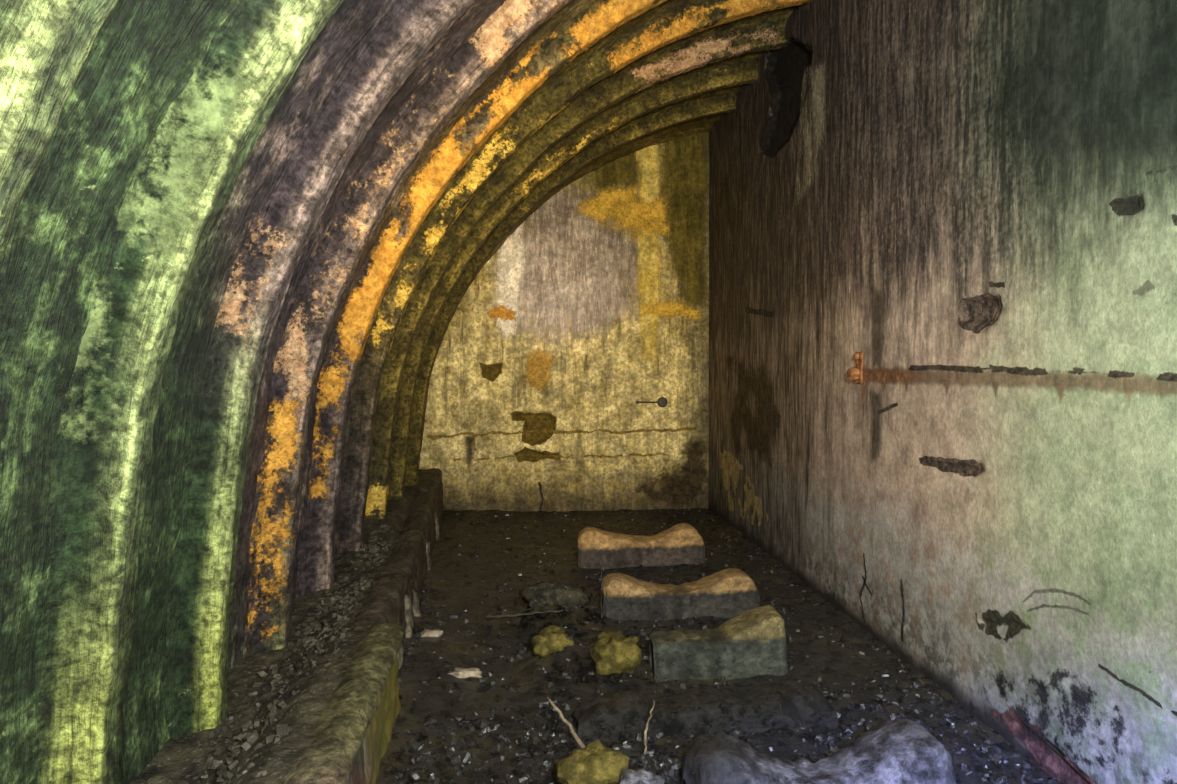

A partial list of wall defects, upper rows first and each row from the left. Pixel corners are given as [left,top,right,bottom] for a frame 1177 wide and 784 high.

water stain [795,62,826,200]
water stain [996,0,1177,212]
spalling [1110,194,1145,215]
peeling [248,0,813,638]
water stain [872,288,884,366]
spalling [958,281,1005,333]
rust [862,368,1177,408]
spalling [919,456,984,477]
crack [1023,588,1091,615]
crack [1098,664,1163,709]
water stain [996,669,1125,770]